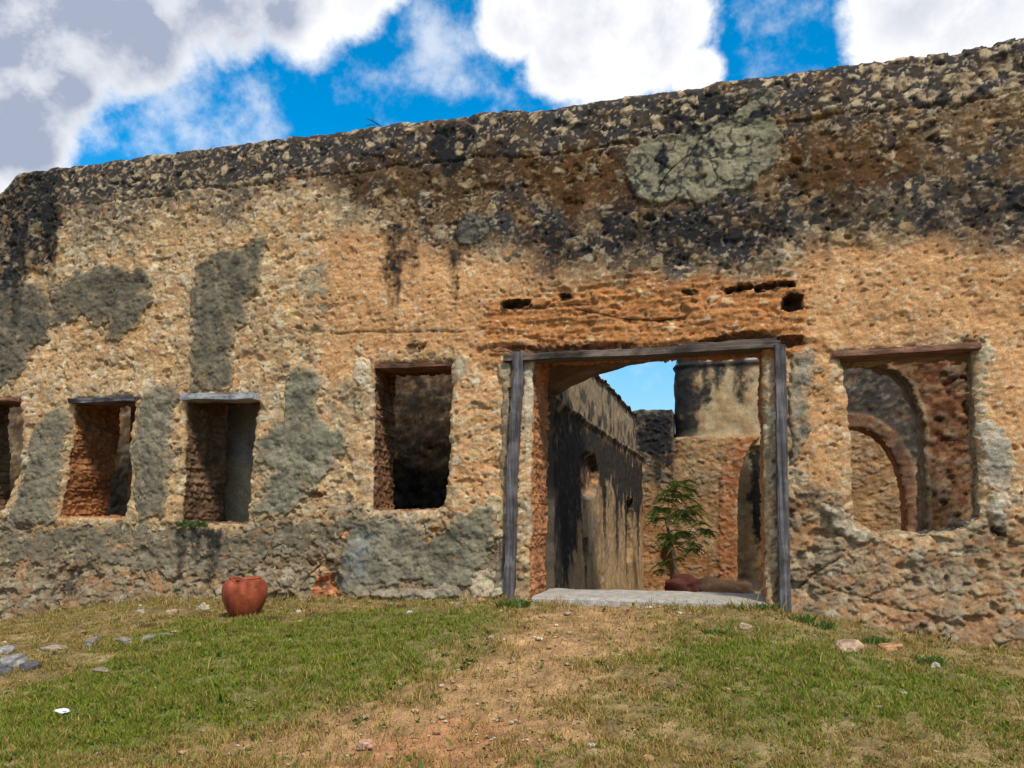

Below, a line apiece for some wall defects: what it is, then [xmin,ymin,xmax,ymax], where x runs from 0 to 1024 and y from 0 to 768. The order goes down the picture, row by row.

crack [648,103,765,187]
damp [0,168,69,318]
damp [383,223,417,302]
damp [519,202,802,260]
damp [802,202,847,230]
damp [890,204,942,229]
damp [949,181,1024,228]
damp [552,357,753,589]